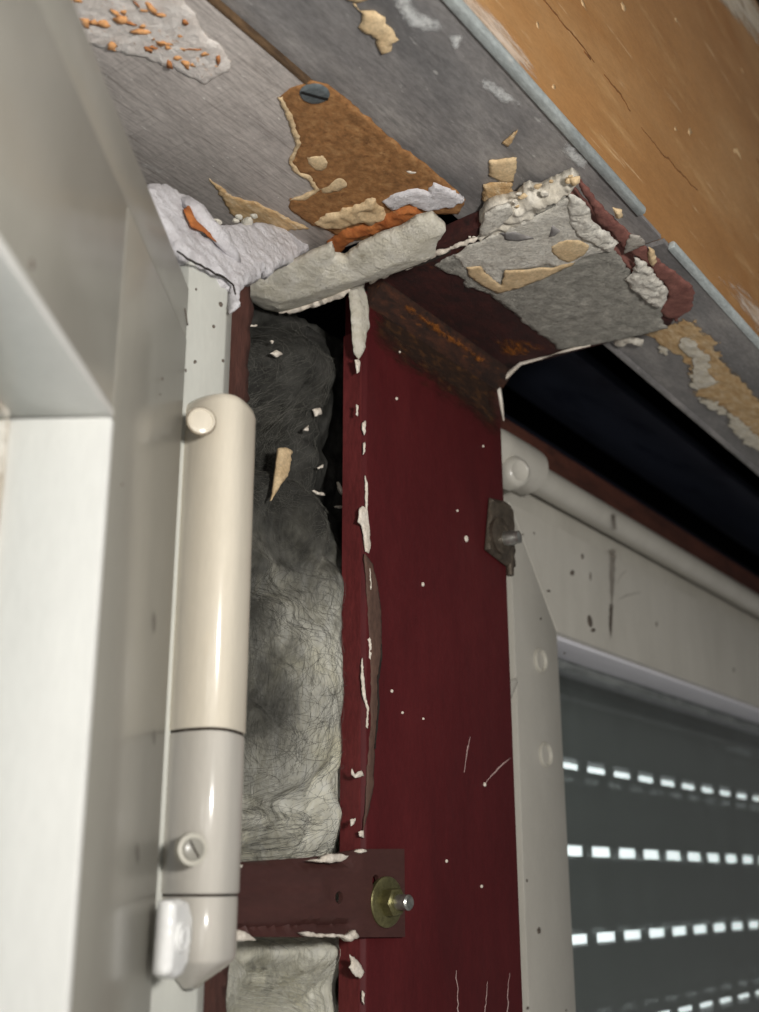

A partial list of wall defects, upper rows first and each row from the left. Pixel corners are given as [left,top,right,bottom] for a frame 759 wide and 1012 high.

spalling [73,0,231,85]
peeling [349,0,399,55]
crack [543,0,697,190]
peeling [147,80,465,315]
corrosion [377,314,499,427]
peeling [424,157,759,451]
peeling [350,475,382,838]